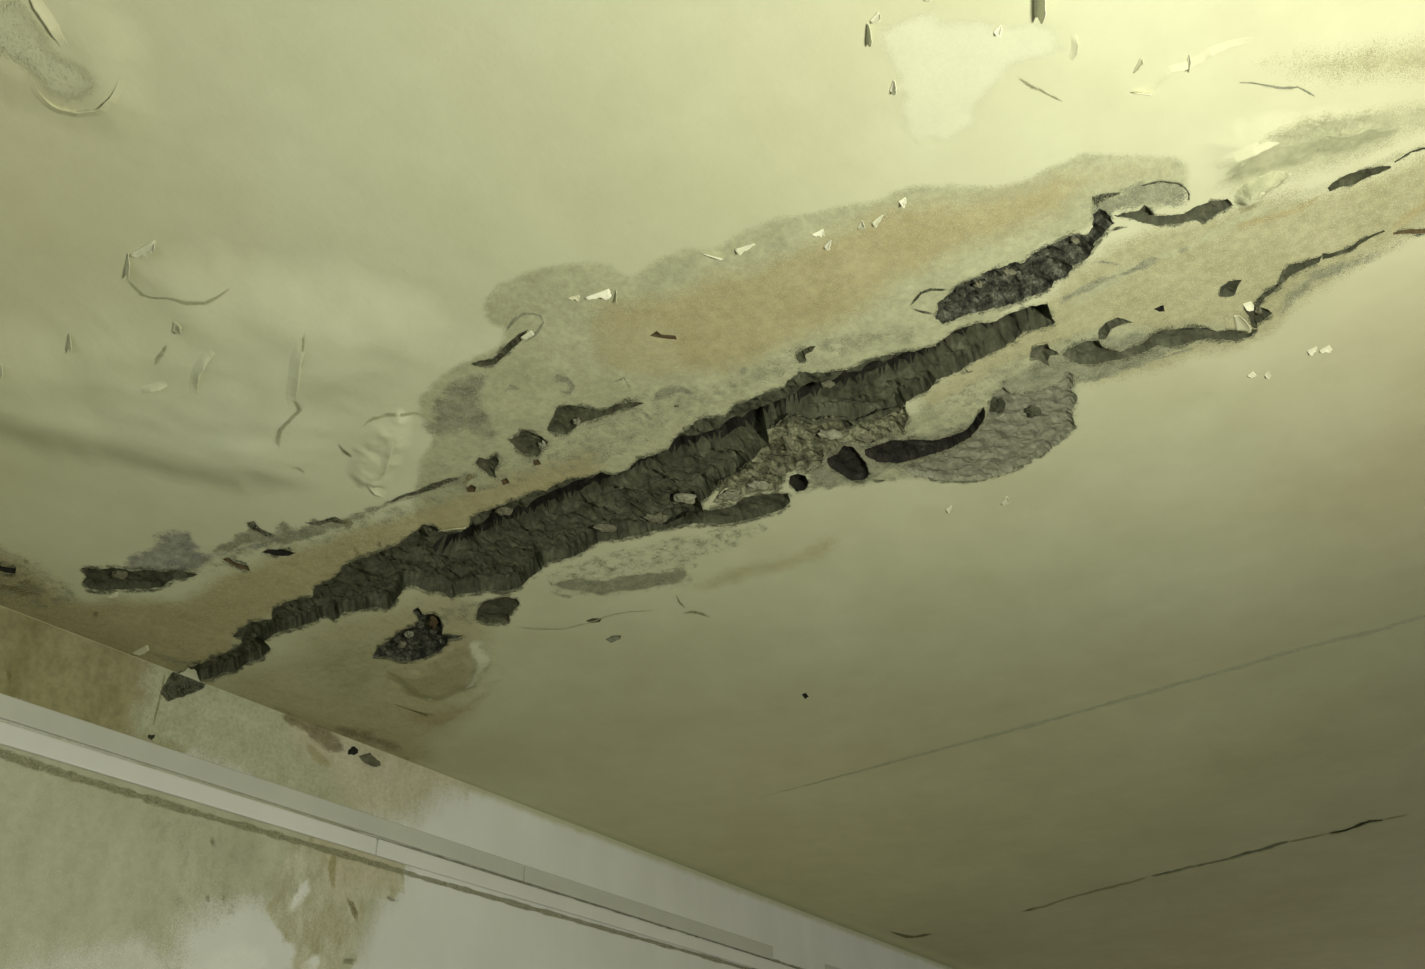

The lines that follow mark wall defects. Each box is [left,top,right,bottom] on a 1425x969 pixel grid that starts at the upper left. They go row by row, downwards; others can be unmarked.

crack [1328,146,1425,191]
leakage [799,32,1425,493]
crack [1322,227,1425,260]
peeling [1306,345,1333,356]
leakage [0,151,1192,812]
spalling [160,198,1322,702]
spalling [79,564,198,599]
crack [757,615,1425,799]
leakage [0,718,411,847]
leakage [0,744,413,969]
crack [1022,815,1408,912]